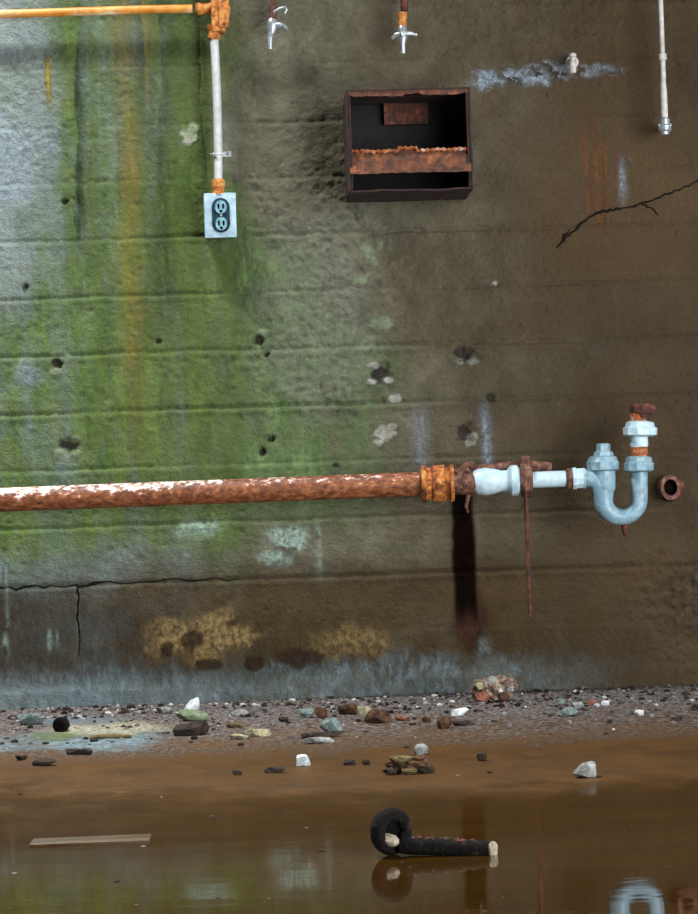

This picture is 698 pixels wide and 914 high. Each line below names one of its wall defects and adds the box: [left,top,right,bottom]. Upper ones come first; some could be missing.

damp [62,0,84,235]
damp [477,64,562,88]
crack [556,180,698,248]
damp [0,567,556,709]